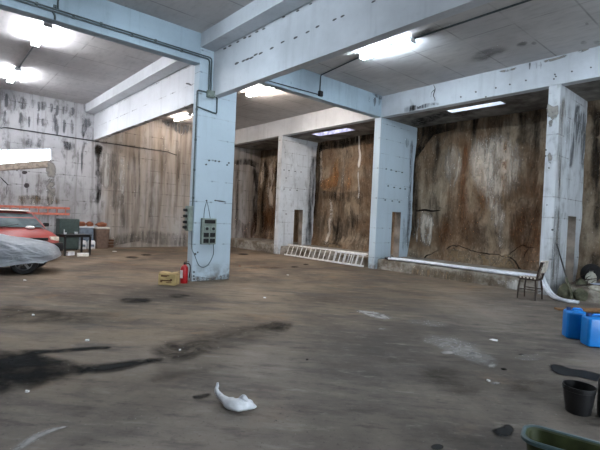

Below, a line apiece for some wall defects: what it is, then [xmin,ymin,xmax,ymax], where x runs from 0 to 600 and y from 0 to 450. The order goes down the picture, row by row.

leakage [3,94,74,135]
leakage [95,145,125,225]
leakage [236,159,277,232]
rust [459,145,468,220]
peeling [547,104,558,127]
leakage [570,105,600,191]
crack [424,242,534,270]
rust [511,212,539,259]